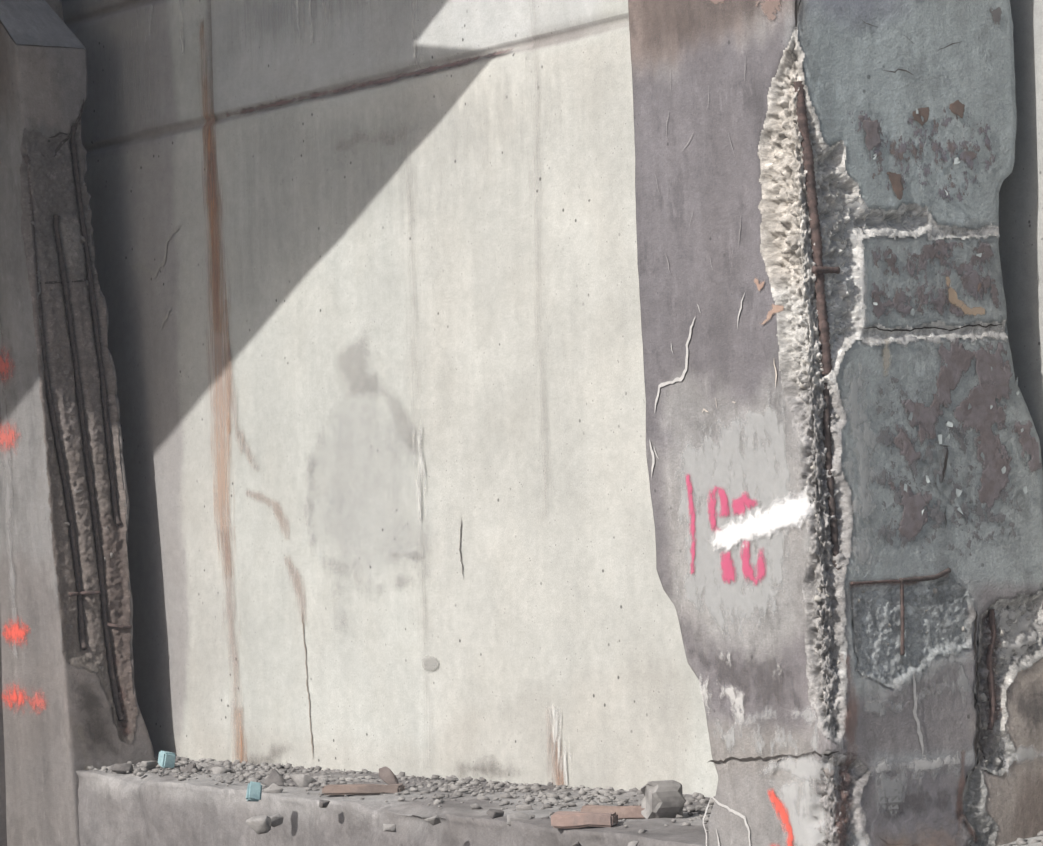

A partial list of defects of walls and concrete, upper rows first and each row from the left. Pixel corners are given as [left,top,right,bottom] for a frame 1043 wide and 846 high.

spalling [20,100,138,744]
rust [203,78,231,566]
rust [226,50,509,117]
spalling [758,27,1043,846]
crack [707,751,839,775]